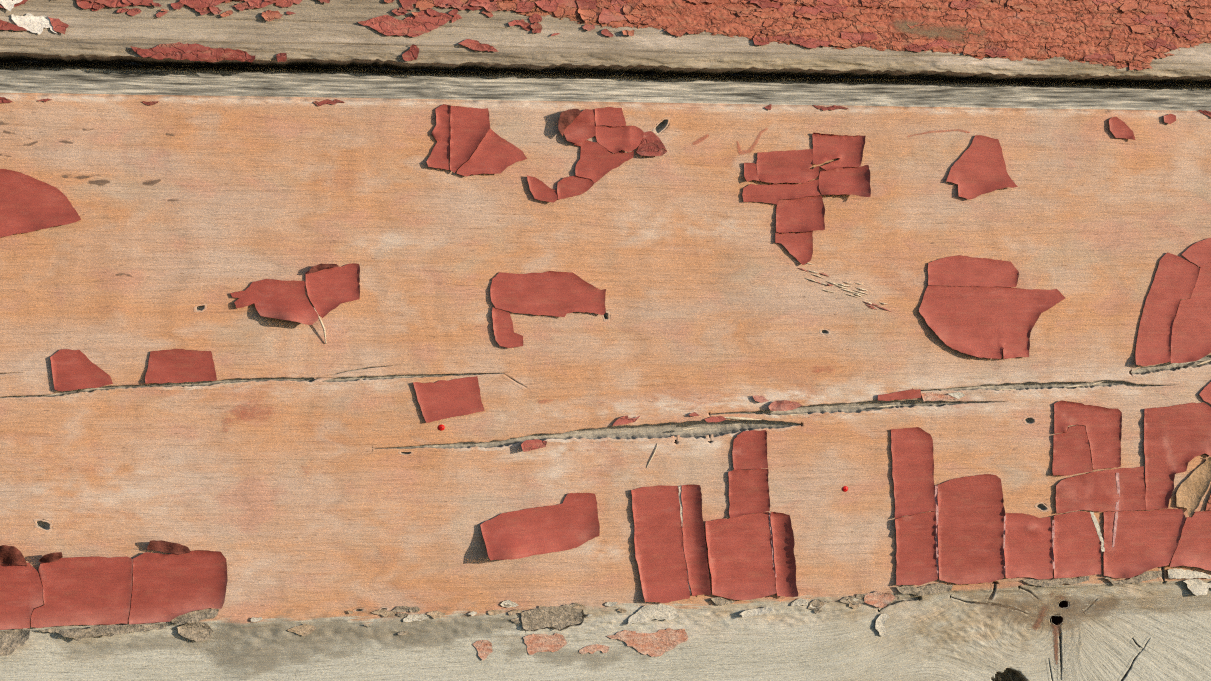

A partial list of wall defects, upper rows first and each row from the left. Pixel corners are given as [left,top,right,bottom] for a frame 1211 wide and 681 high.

peeling [130,42,256,63]
peeling [0,169,81,238]
peeling [426,104,527,176]
peeling [527,107,671,203]
peeling [742,133,871,265]
peeling [919,255,1065,359]
peeling [1135,238,1211,366]
crack [0,362,528,402]
crack [372,353,1211,452]
peeling [480,493,600,560]
peeling [579,382,1211,657]
peeling [0,540,228,656]